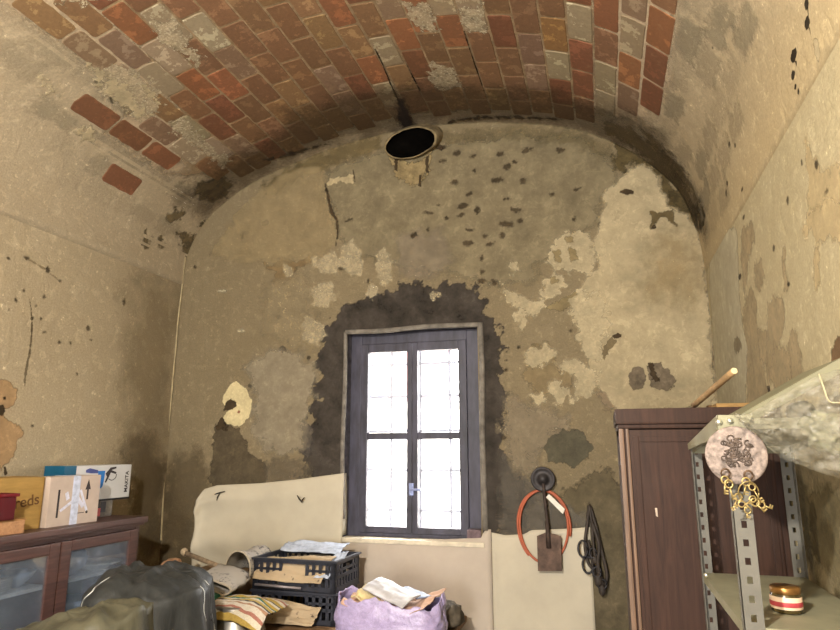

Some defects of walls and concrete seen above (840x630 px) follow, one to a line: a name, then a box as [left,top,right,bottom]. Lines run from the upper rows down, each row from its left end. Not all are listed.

leakage [166,206,185,223]
leakage [176,87,705,259]
flaking render [264,130,717,409]
peeling [0,379,34,475]
leakage [128,279,629,630]